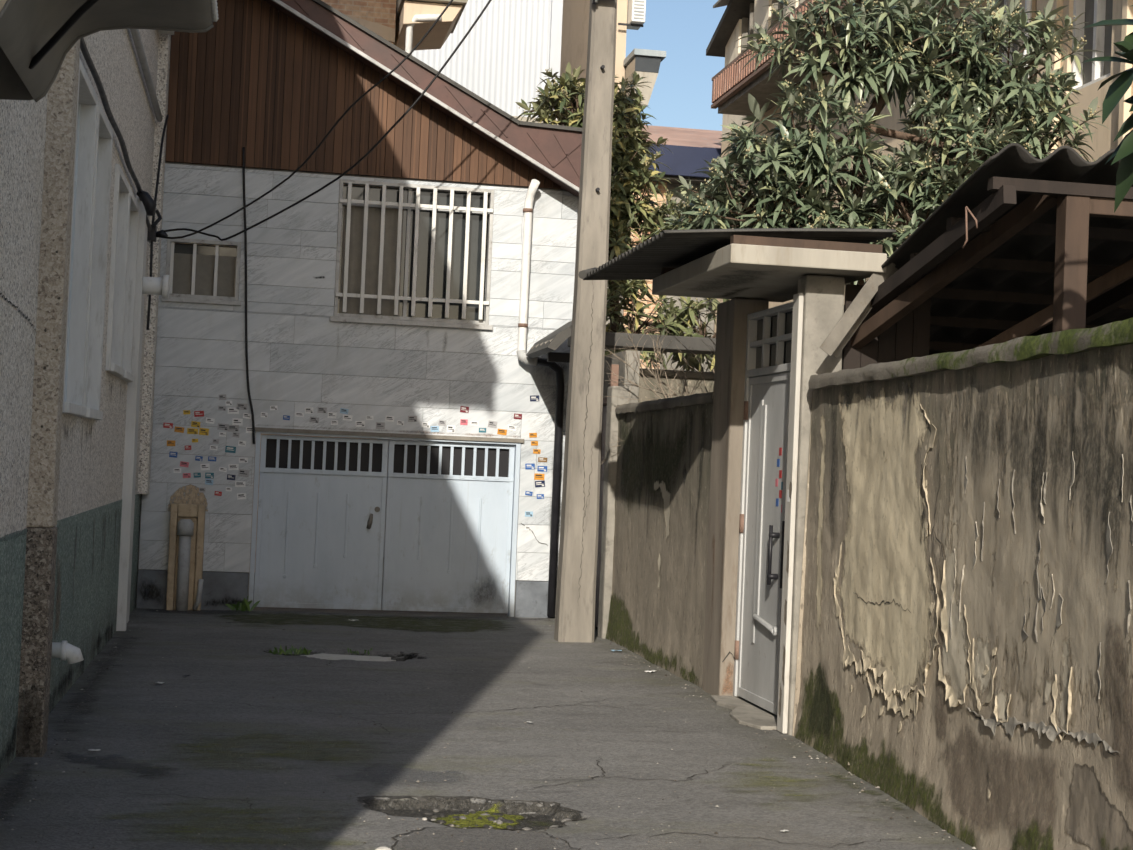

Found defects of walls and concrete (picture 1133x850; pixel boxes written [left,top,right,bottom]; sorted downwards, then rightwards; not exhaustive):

damp [619,412,704,519]
peeling [654,480,670,539]
peeling [816,347,1133,756]
damp [966,361,1133,544]
crack [517,757,736,791]